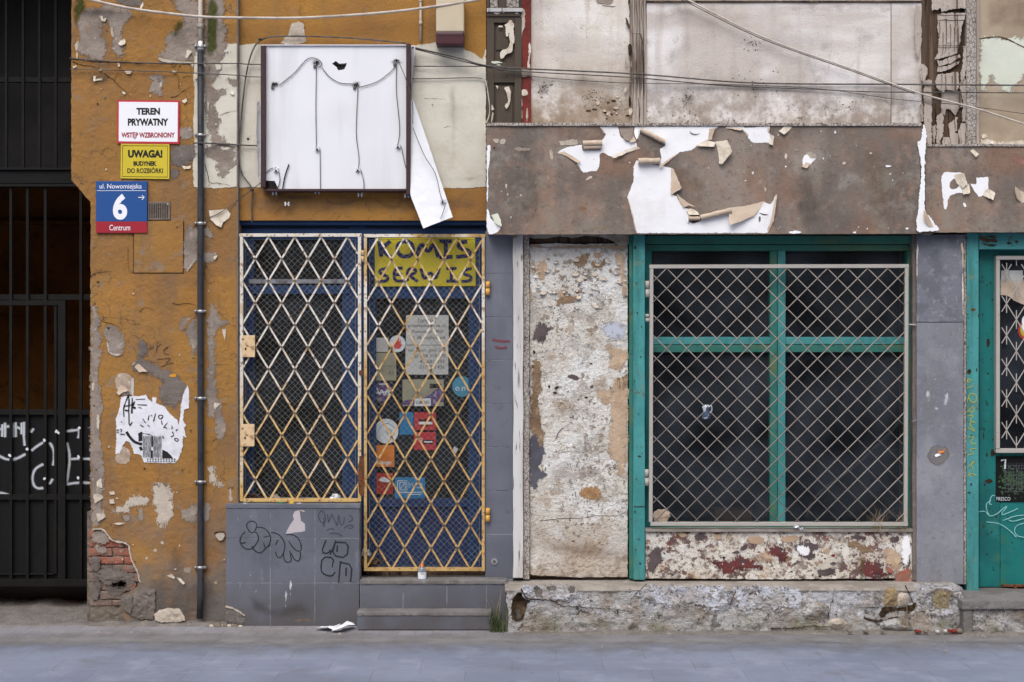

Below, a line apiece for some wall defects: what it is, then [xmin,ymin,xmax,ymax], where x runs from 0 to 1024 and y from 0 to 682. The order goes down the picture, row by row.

peeling [73,0,144,105]
peeling [148,0,249,185]
peeling [492,9,525,66]
peeling [491,43,532,122]
peeling [549,96,801,234]
peeling [941,172,995,209]
peeling [179,290,230,441]
peeling [529,322,641,489]
peeling [88,305,212,622]
peeling [564,481,611,524]
spalling [508,585,575,621]
peeling [635,532,917,618]